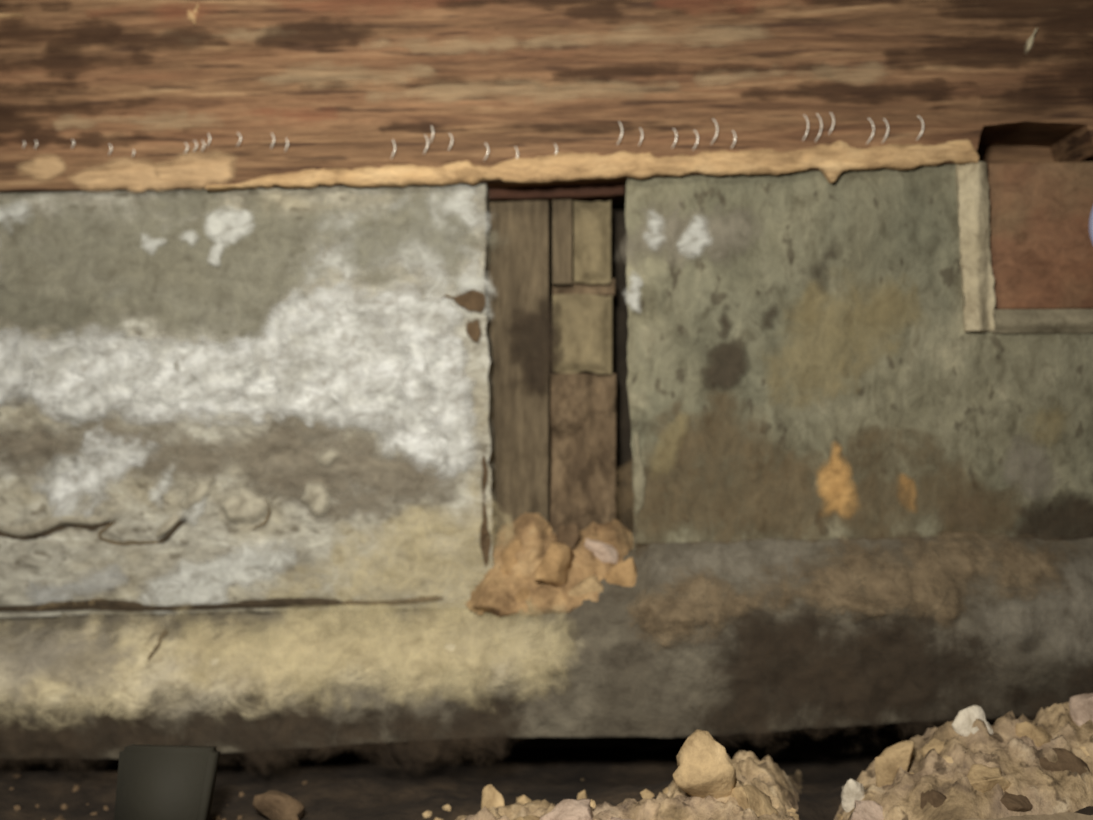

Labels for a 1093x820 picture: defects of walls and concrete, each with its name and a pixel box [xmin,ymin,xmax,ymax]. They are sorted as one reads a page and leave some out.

water stain [0,183,488,521]
corrosion [819,445,854,515]
crack [0,511,187,545]
water stain [622,314,1093,739]
crack [0,596,443,661]